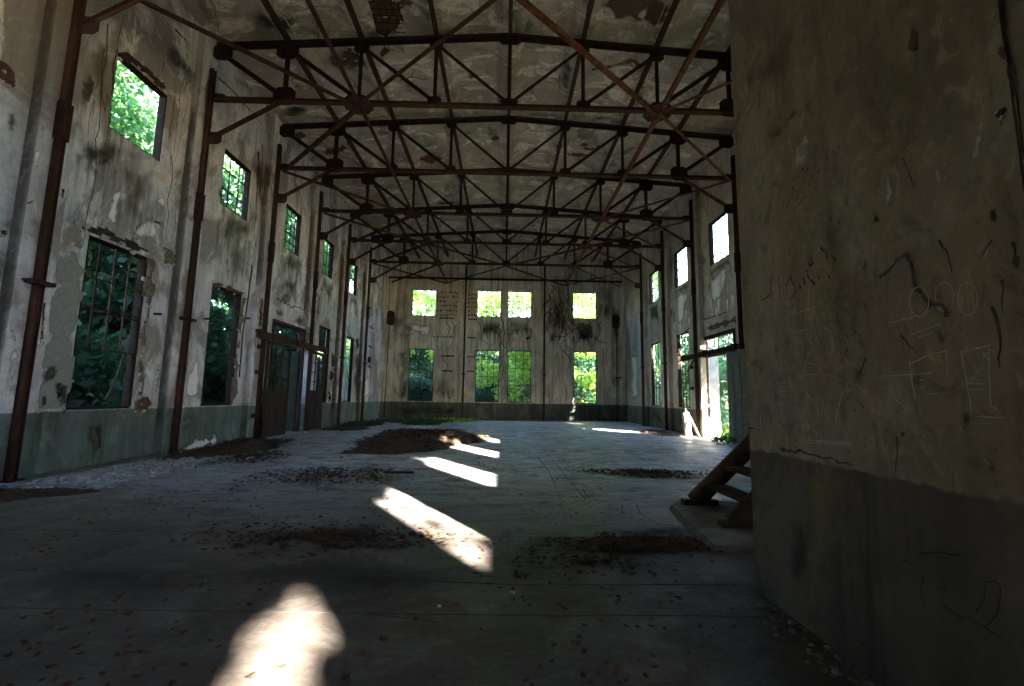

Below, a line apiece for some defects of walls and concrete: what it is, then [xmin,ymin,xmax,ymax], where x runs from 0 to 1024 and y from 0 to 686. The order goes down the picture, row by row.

spalling [362,0,413,59]
mould [87,145,120,161]
peeling [36,220,176,413]
peeling [183,435,217,450]
crack [779,447,855,466]